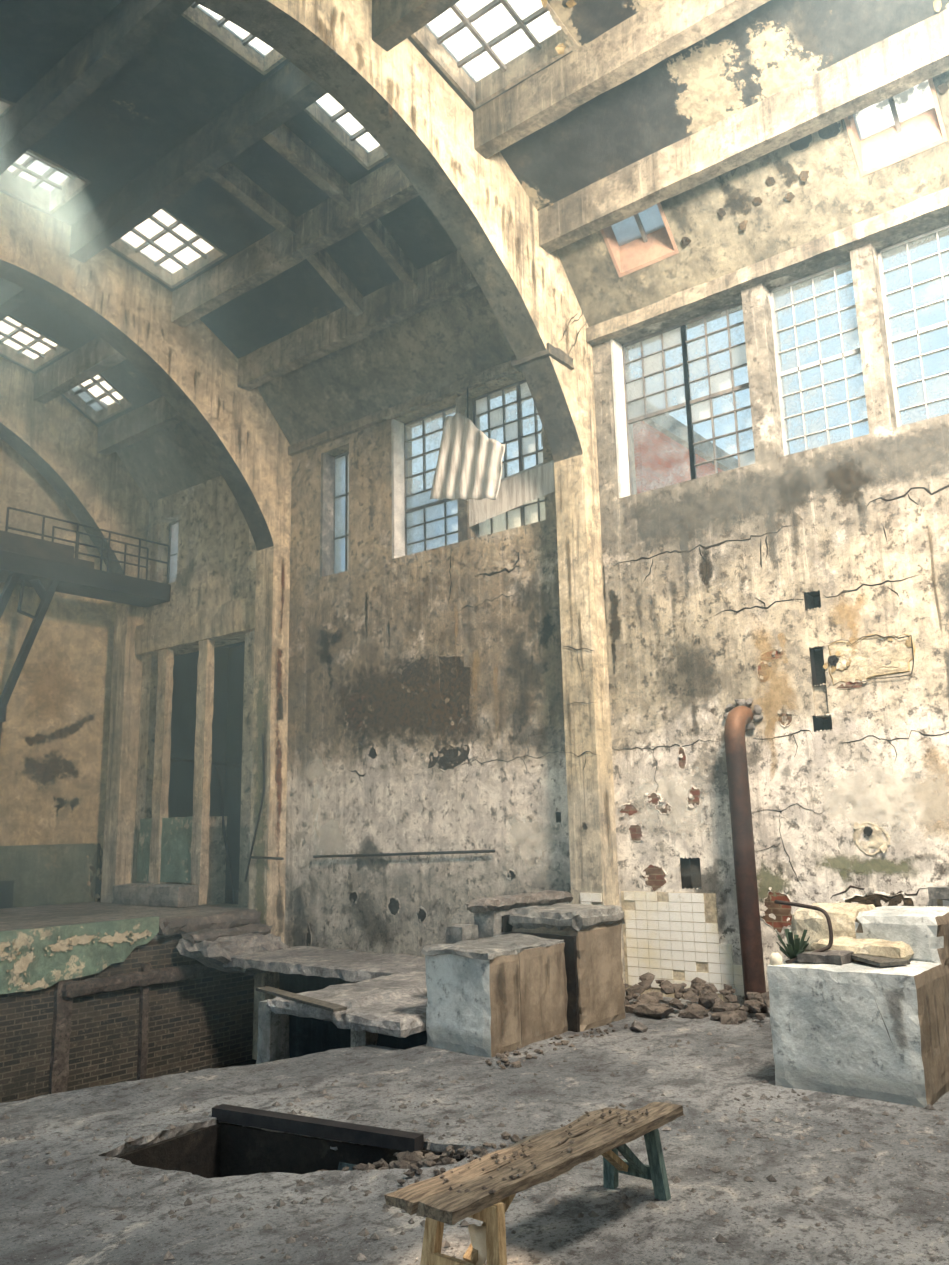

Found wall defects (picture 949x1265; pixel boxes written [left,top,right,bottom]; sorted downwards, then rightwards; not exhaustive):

peeling [624,0,659,14]
peeling [664,21,823,135]
water stain [633,425,949,592]
crack [866,485,949,541]
crack [611,525,791,583]
crack [716,575,917,615]
water stain [316,622,481,763]
spalling [809,645,868,690]
crack [754,730,812,757]
crack [842,730,949,763]
spalling [640,857,701,892]
peeling [0,929,152,992]